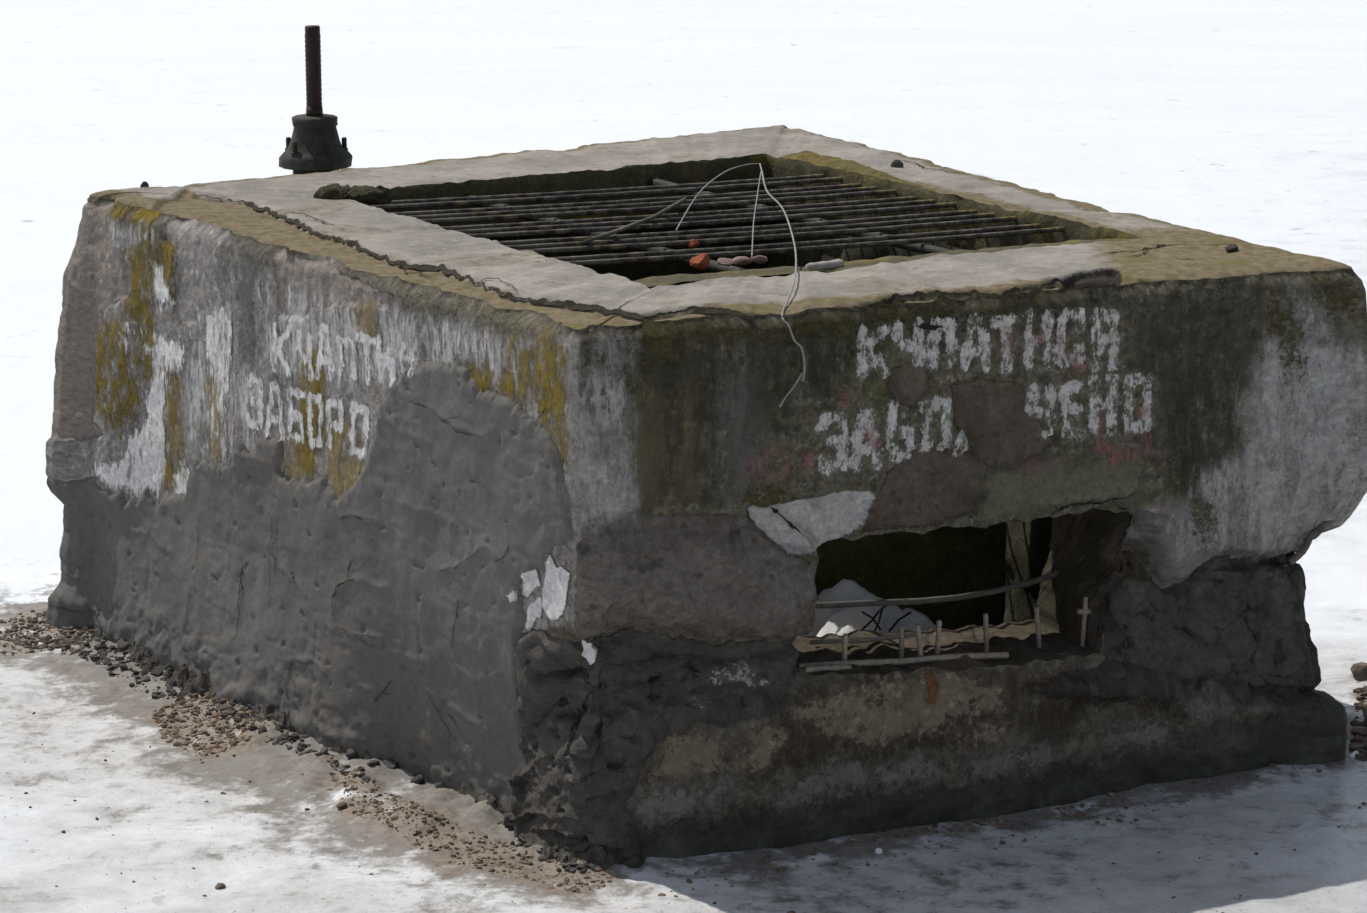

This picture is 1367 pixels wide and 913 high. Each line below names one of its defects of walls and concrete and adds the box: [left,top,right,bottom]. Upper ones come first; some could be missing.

spalling [49,201,525,505]
leakage [563,336,702,532]
leakage [1165,300,1367,564]
crack [235,517,294,636]
crack [331,560,376,647]
crack [441,546,509,646]
peeling [507,555,570,629]
peeling [582,640,597,665]
corrosion [747,671,1129,780]